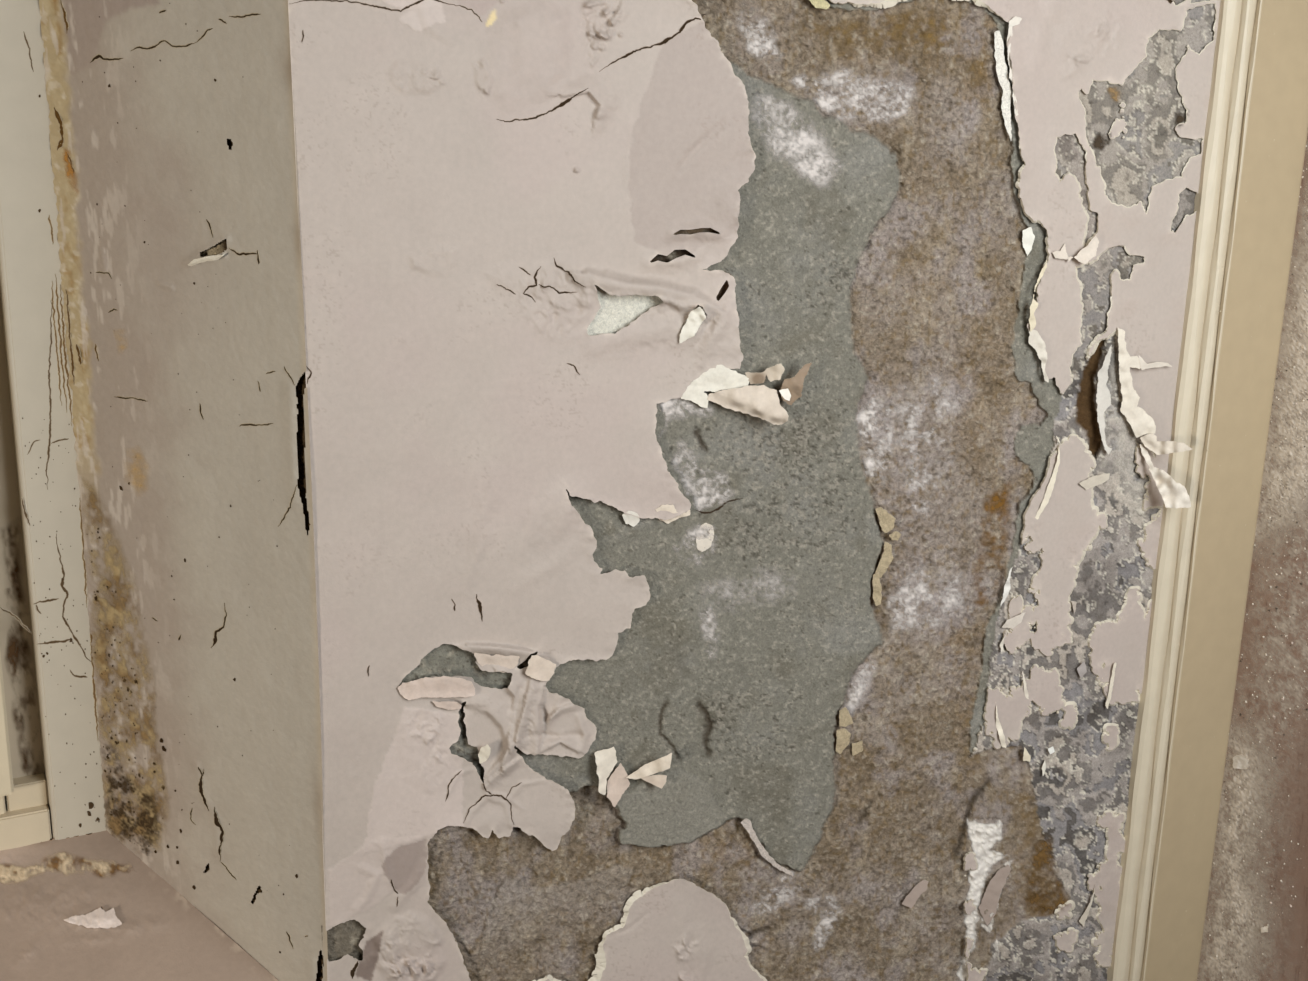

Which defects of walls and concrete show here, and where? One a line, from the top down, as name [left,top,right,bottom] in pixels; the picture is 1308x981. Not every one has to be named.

crack [23,31,34,72]
crack [60,0,69,33]
crack [90,10,260,63]
crack [289,0,482,42]
crack [497,14,706,123]
crack [54,107,75,172]
crack [206,219,260,264]
crack [240,366,312,535]
flaking render [392,0,1216,981]
crack [211,603,227,648]
mould [87,487,169,854]
crack [190,767,237,880]